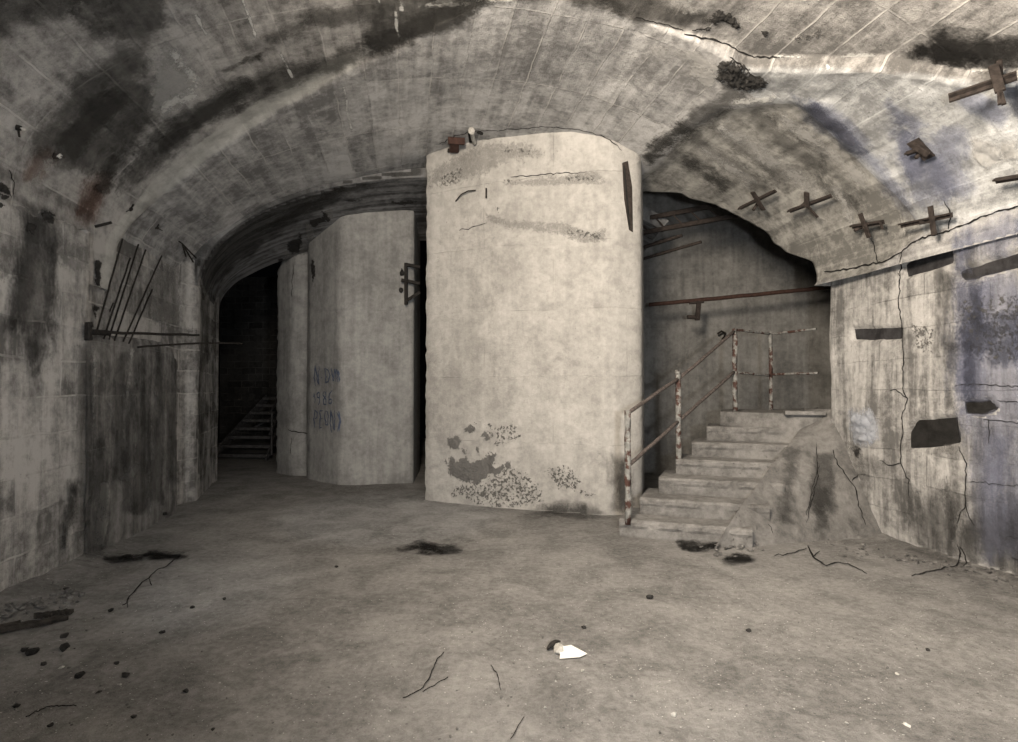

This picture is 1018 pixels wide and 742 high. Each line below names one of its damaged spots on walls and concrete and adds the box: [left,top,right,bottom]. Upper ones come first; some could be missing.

water stain [153,47,202,113]
crack [636,17,786,84]
spalling [716,60,767,92]
water stain [915,31,1018,73]
crack [806,201,1018,525]
peeling [445,421,542,507]
peeling [548,465,596,496]
crack [911,448,1017,576]
crack [768,524,867,574]